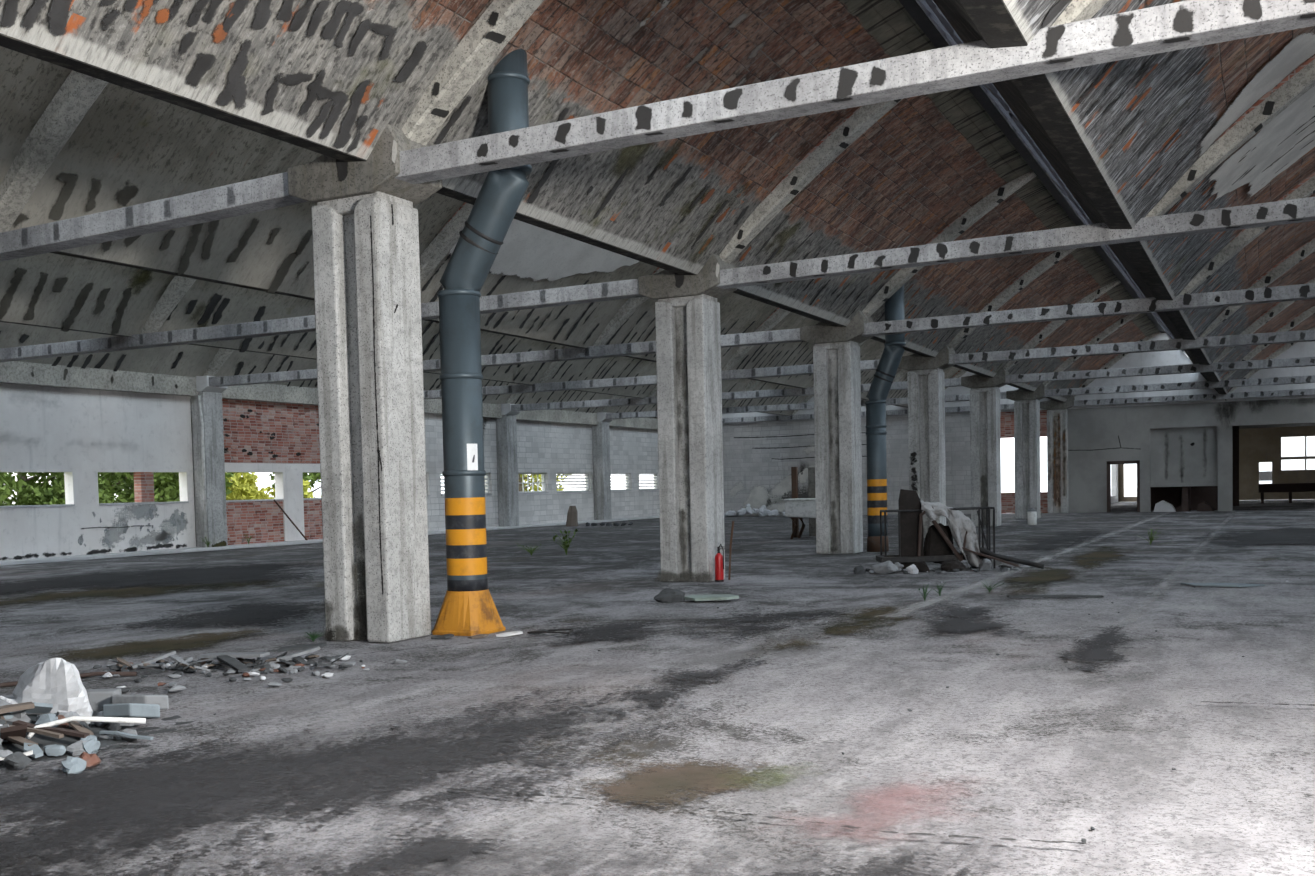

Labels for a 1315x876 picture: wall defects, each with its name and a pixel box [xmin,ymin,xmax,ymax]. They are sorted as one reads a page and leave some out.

water stain [0,0,72,36]
water stain [100,0,397,109]
water stain [262,68,371,182]
water stain [394,41,427,83]
peeling [1172,86,1315,212]
peeling [1199,33,1315,156]
peeling [490,219,639,282]
peeling [0,504,187,560]